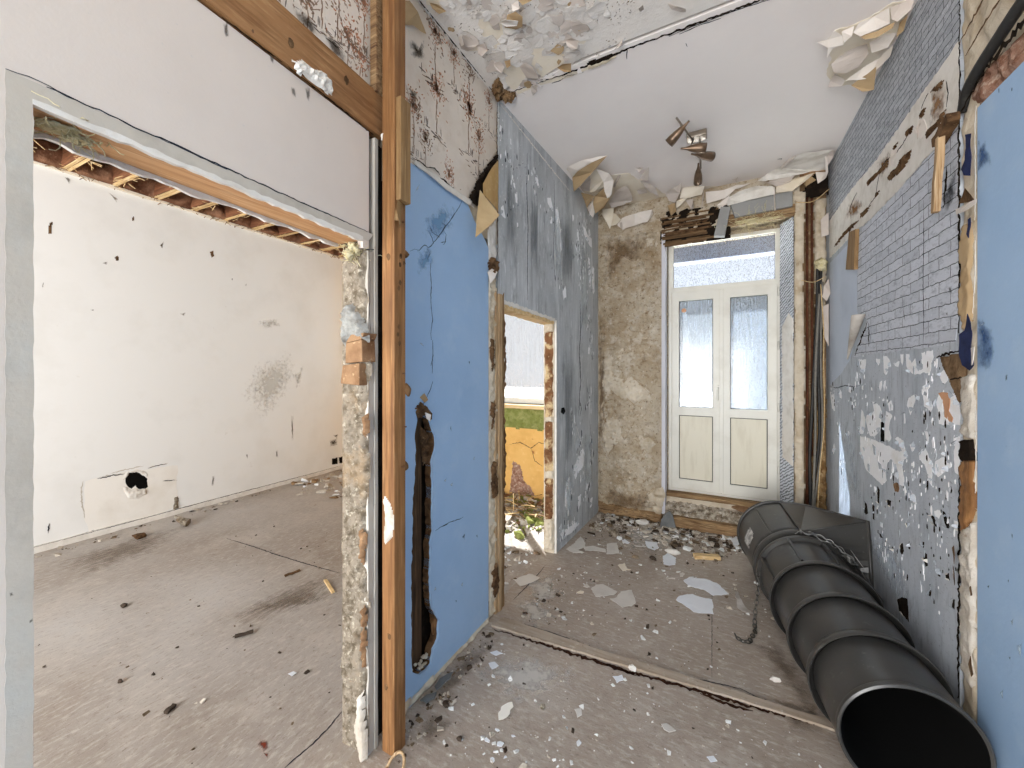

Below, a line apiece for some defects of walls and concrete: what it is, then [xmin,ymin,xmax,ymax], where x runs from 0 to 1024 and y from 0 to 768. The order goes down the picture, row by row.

flaking render [4,69,377,768]
crack [411,158,462,404]
crack [494,567,814,725]
peeling [405,0,977,715]